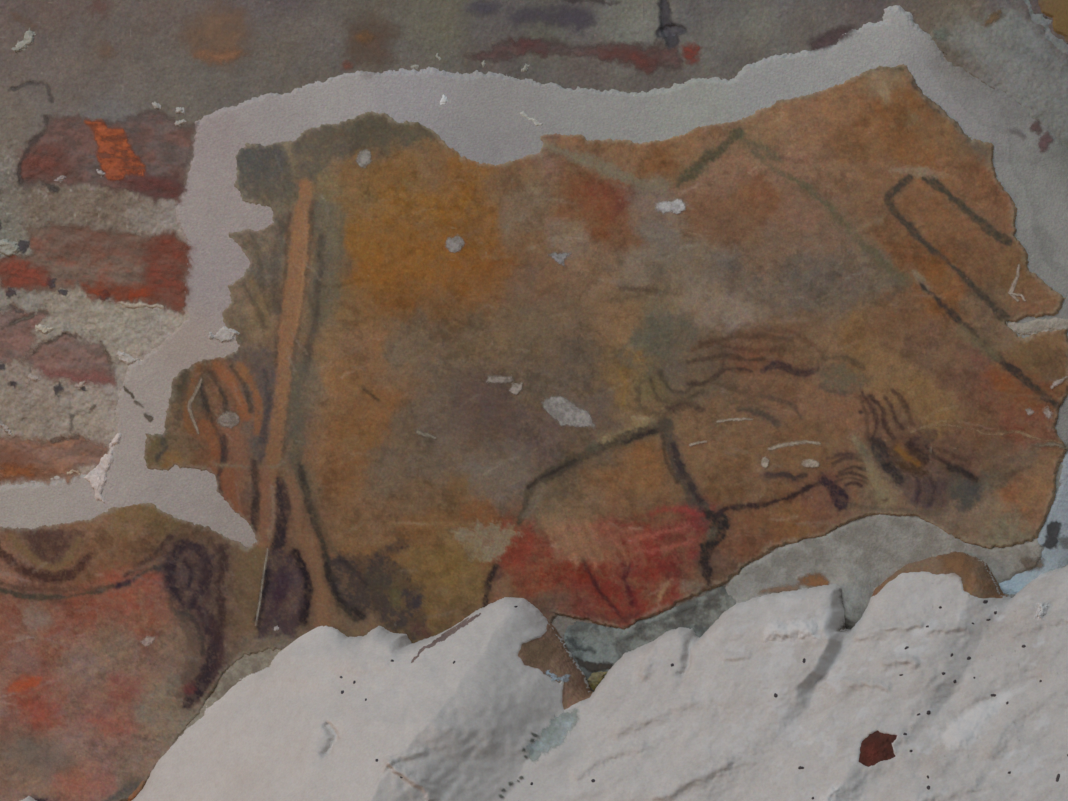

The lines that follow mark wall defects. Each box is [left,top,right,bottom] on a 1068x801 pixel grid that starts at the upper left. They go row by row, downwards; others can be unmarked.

flaking render [810,27,853,50]
flaking render [473,38,700,72]
peeling [356,149,371,167]
peeling [656,199,685,214]
peeling [446,236,464,253]
peeling [208,326,240,343]
peeling [486,376,522,395]
peeling [543,396,594,427]
peeling [802,459,819,467]
peeling [872,551,1008,598]
peeling [411,613,481,663]
peeling [518,620,608,710]